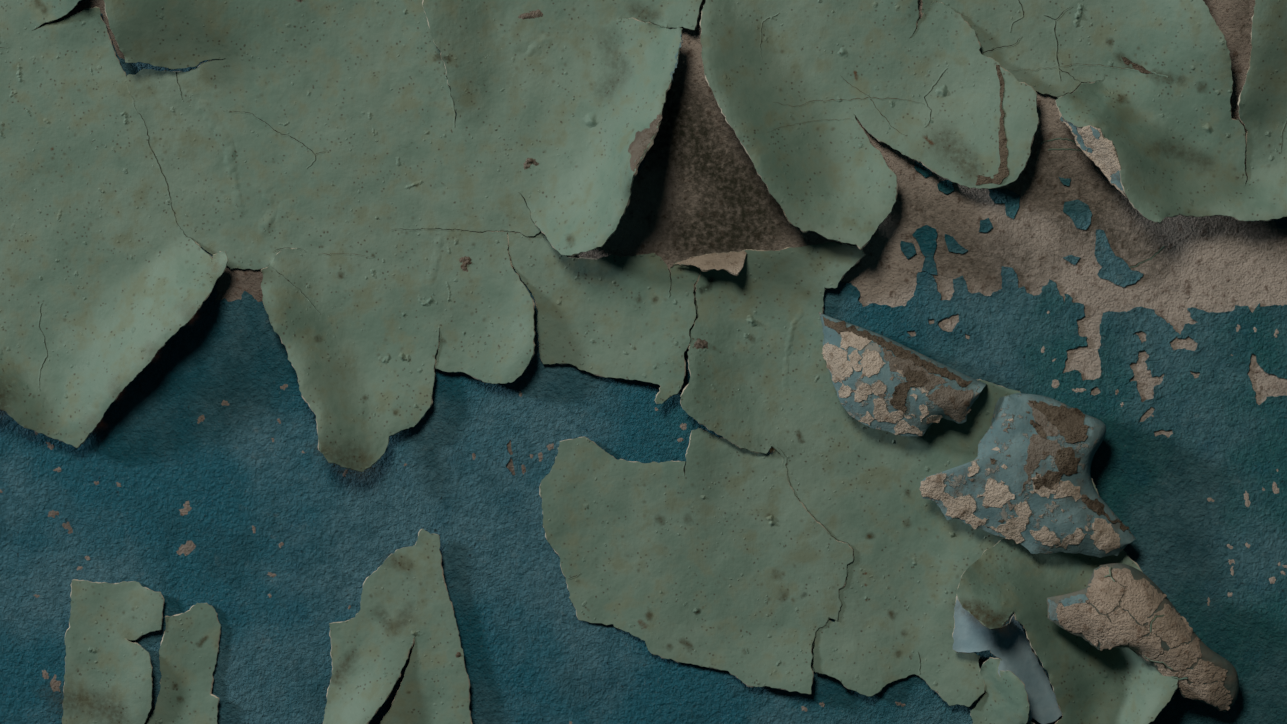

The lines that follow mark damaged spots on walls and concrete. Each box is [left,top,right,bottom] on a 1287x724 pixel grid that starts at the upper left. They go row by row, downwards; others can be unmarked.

crack [983,0,1106,98]
crack [126,81,212,261]
peeling [0,0,742,475]
peeling [539,0,1287,724]
peeling [42,556,221,724]
spalling [179,501,191,516]
spalling [176,540,196,556]
peeling [323,529,472,724]
crack [775,446,854,672]